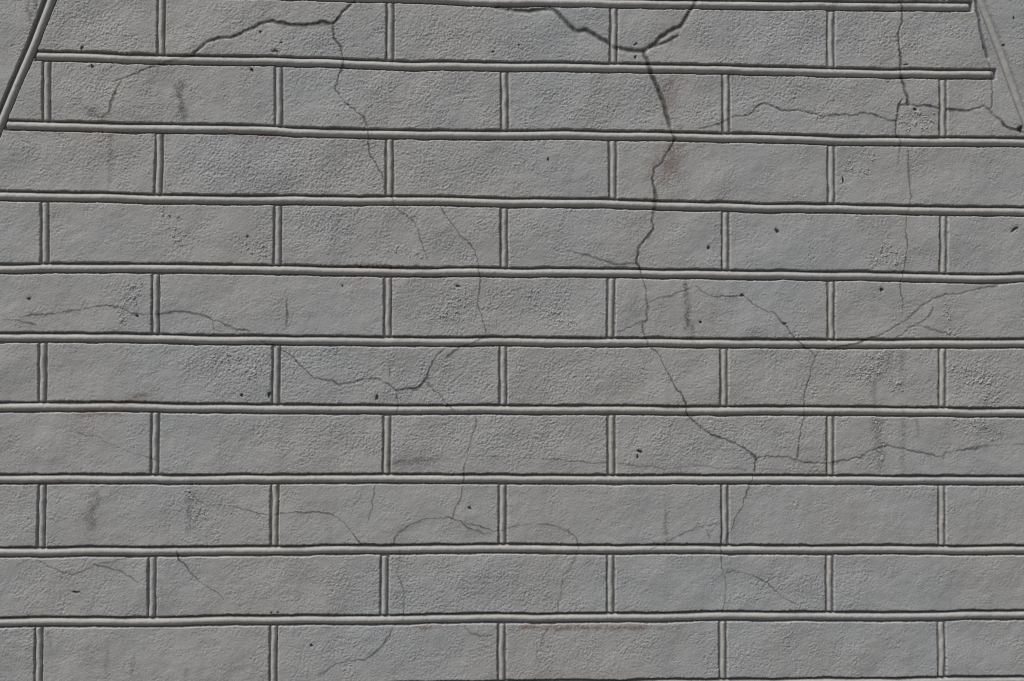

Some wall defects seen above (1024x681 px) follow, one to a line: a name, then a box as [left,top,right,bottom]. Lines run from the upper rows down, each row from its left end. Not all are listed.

crack [272,10,345,42]
crack [895,10,961,125]
crack [647,64,675,150]
crack [585,226,654,270]
crack [395,350,455,399]